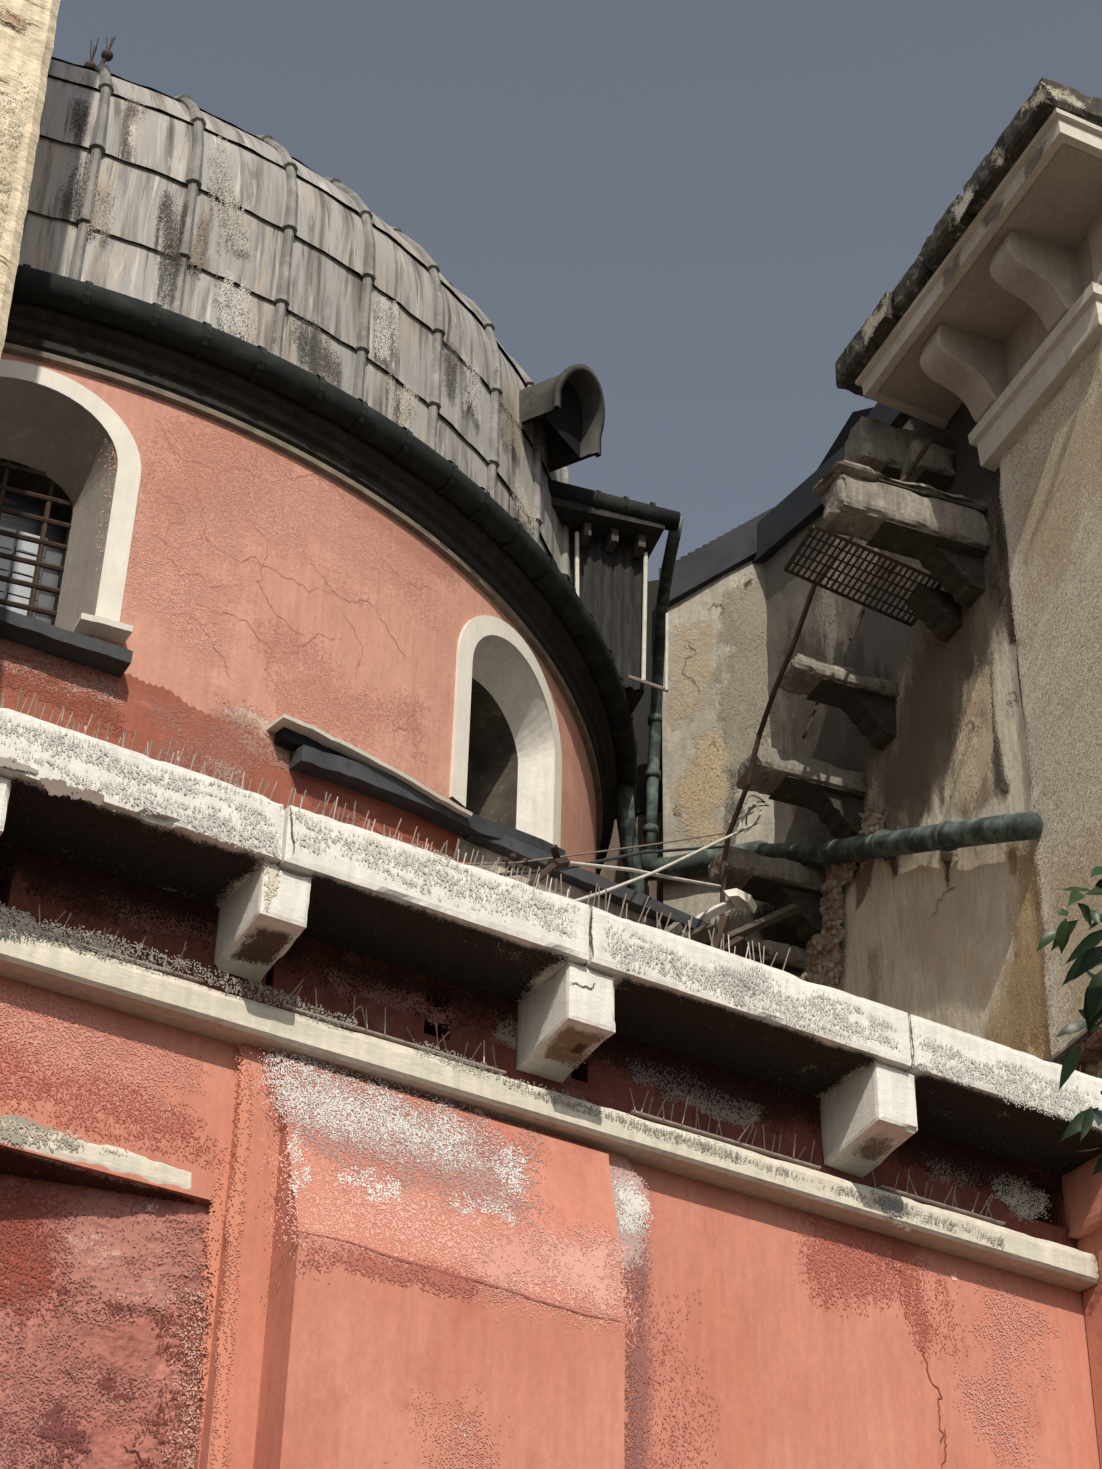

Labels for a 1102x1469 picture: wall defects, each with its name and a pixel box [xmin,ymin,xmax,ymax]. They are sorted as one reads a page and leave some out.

water stain [151,136,259,341]
crack [149,415,437,682]
water stain [710,402,1016,845]
water stain [0,638,580,936]
water stain [250,1042,555,1226]
water stain [609,1154,720,1469]
water stain [413,1039,1005,1363]
flaking render [799,861,858,991]
flaking render [857,807,887,836]
crack [923,1350,947,1469]
water stain [918,840,1102,1129]
flaking render [1084,1060,1102,1078]